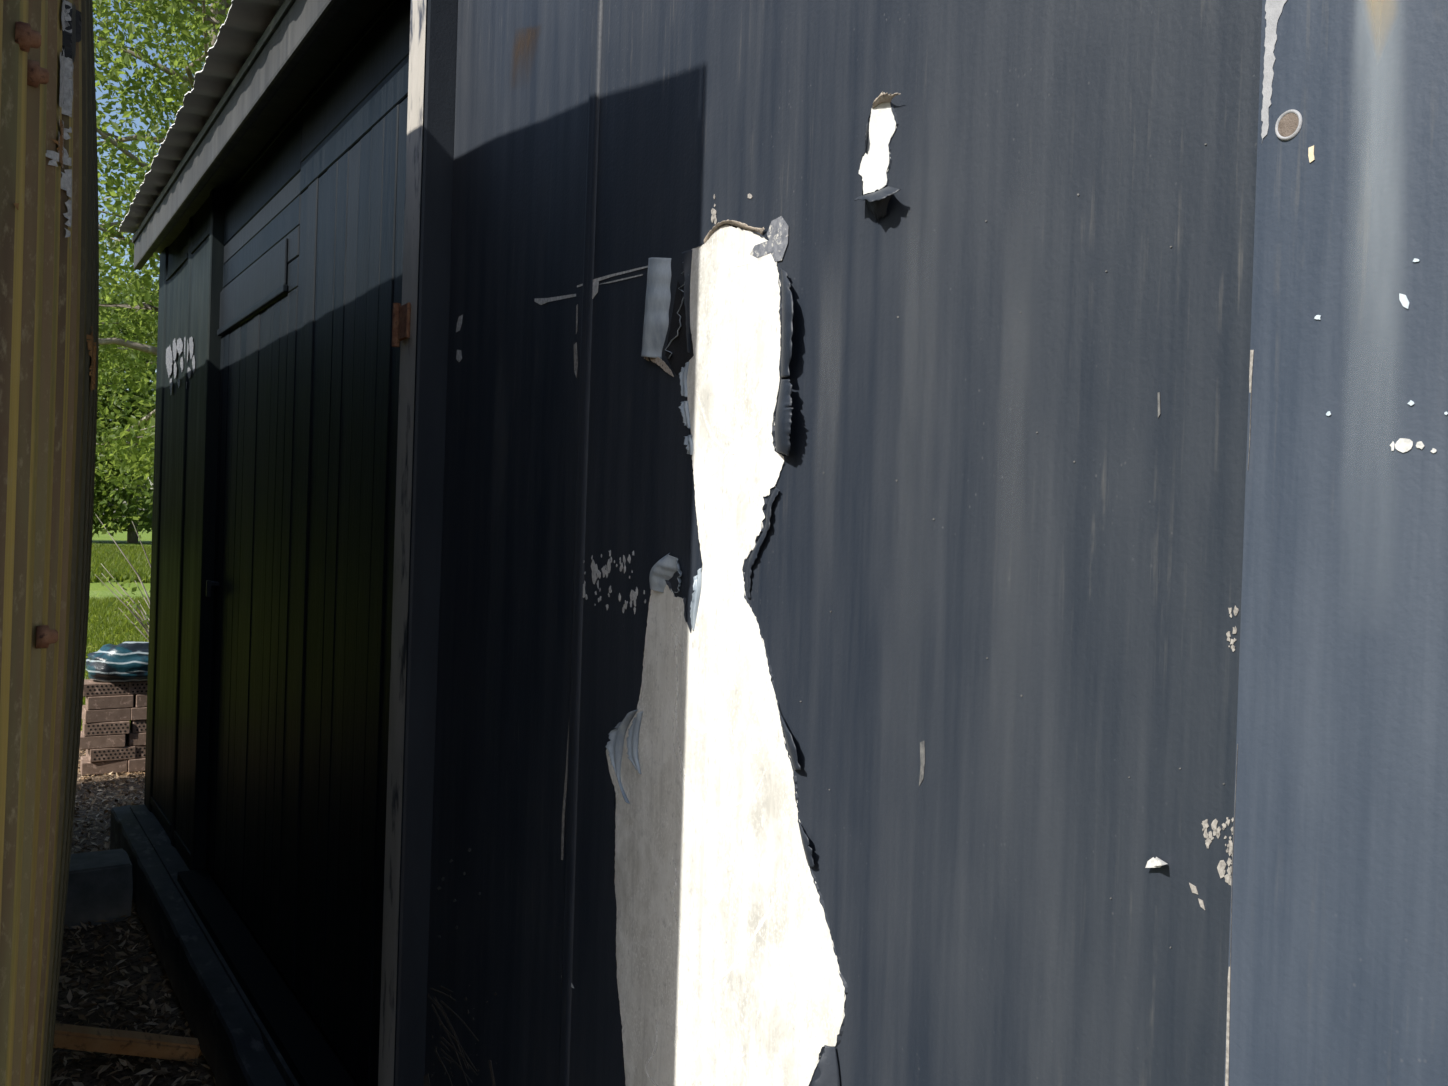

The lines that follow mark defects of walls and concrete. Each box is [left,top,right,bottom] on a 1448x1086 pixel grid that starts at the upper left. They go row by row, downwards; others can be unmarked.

peeling [1261,0,1287,141]
peeling [855,91,901,222]
peeling [1390,438,1437,453]
peeling [583,194,848,1086]
spalling [1145,857,1167,868]
peeling [1202,817,1234,885]